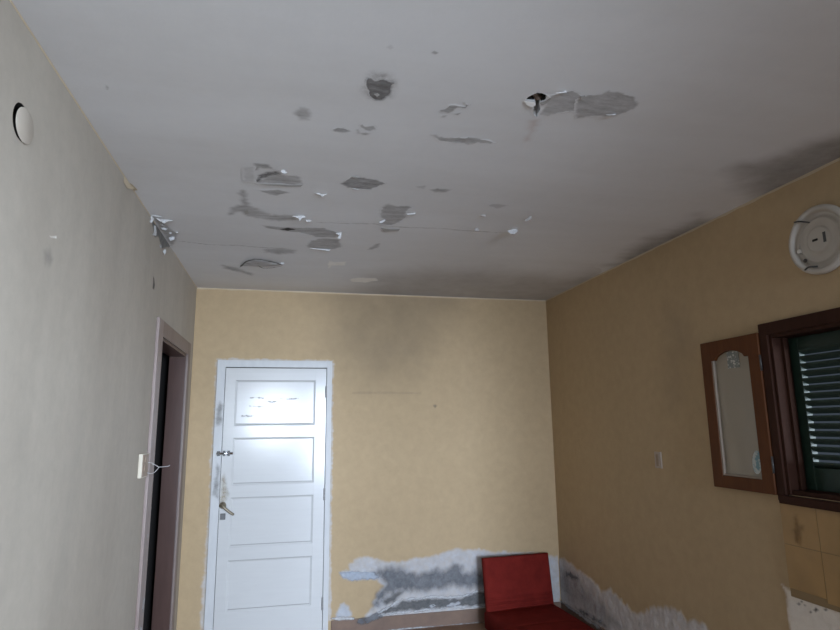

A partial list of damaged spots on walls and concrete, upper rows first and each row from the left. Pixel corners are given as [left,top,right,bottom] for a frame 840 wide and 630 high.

peeling [357,68,402,103]
peeling [522,89,641,119]
peeling [429,133,498,146]
peeling [339,175,388,190]
flaking render [150,214,179,255]
peeling [225,162,343,251]
peeling [377,203,415,232]
flaking render [780,582,840,630]